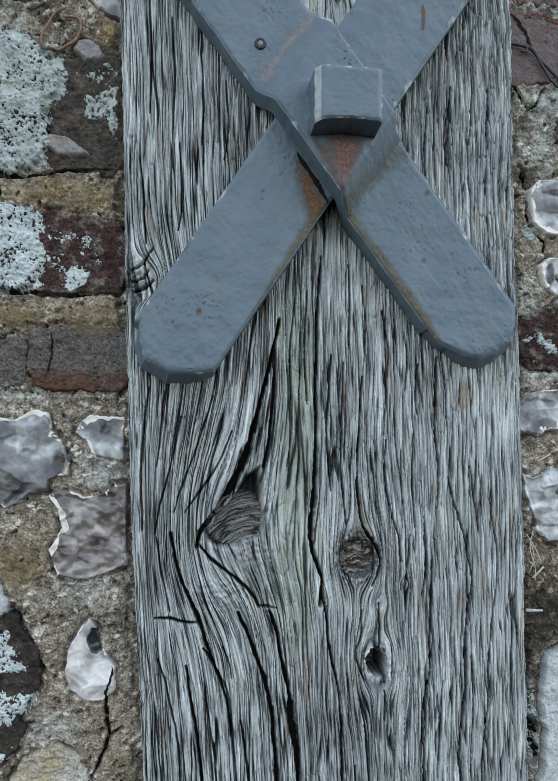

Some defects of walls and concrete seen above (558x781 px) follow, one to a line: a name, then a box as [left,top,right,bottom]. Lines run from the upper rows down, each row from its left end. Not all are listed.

corrosion [299,164,325,219]
crack [88,667,122,781]